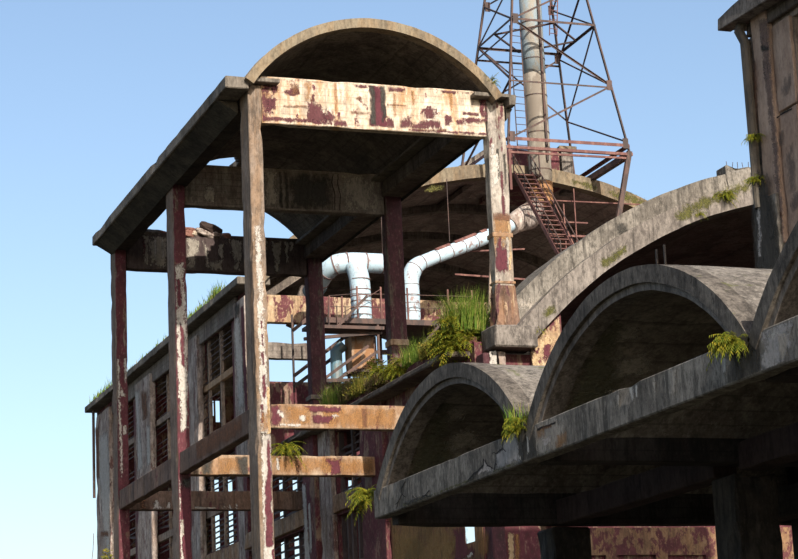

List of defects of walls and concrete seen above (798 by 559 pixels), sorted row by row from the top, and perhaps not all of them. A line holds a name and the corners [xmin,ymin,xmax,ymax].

peeling [262,80,347,126]
peeling [352,85,488,135]
peeling [490,154,512,272]
peeling [175,262,188,432]
peeling [234,304,248,411]
peeling [255,226,341,559]
peeling [179,477,192,559]